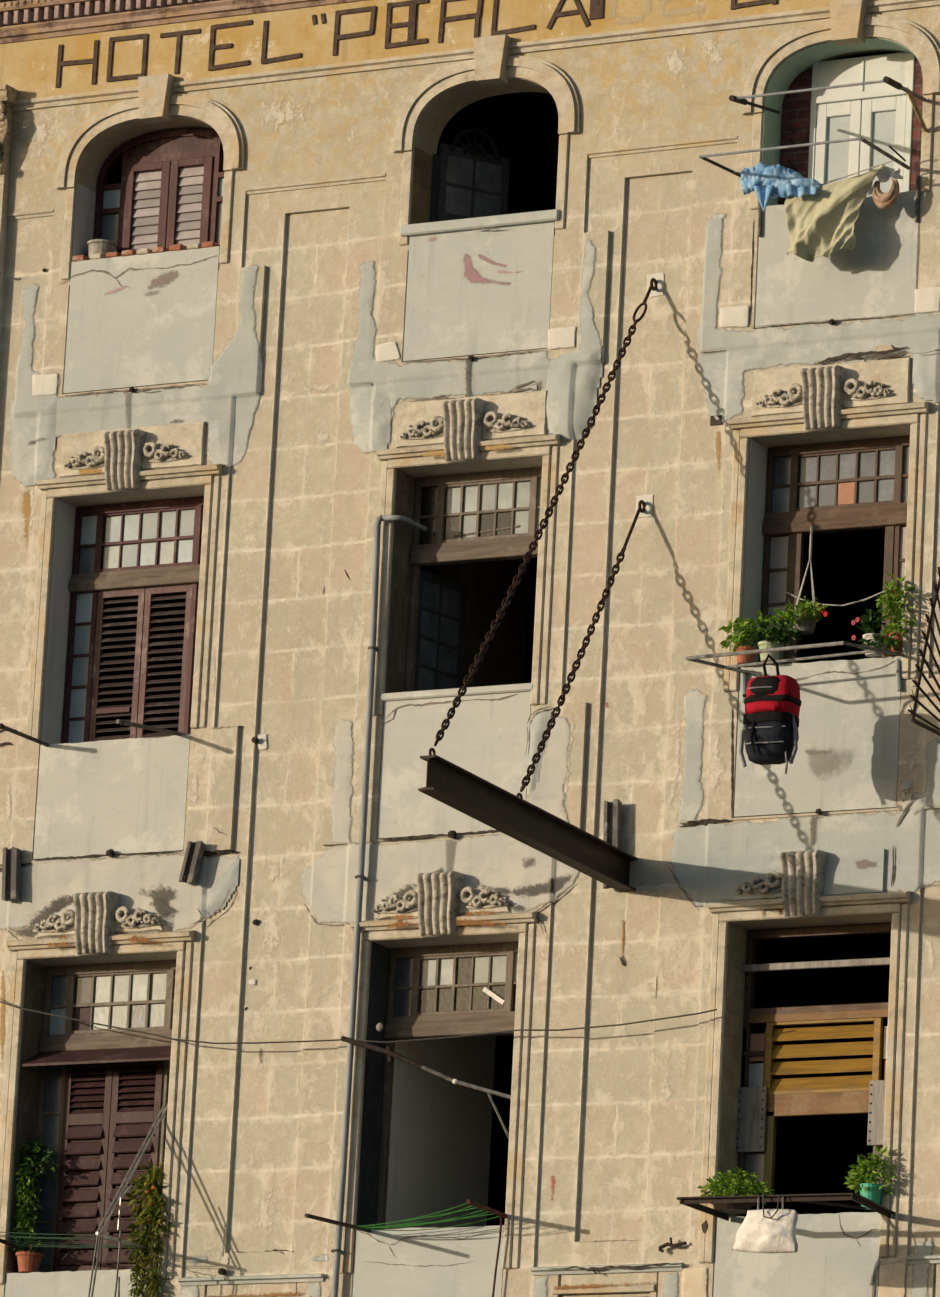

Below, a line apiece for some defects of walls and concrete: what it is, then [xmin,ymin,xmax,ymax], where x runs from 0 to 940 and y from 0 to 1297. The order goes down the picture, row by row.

flaking render [780,71,812,178]
crack [61,256,215,288]
flaking render [827,344,905,364]
flaking render [857,859,876,868]
damp [142,885,176,932]
crack [356,1230,485,1267]